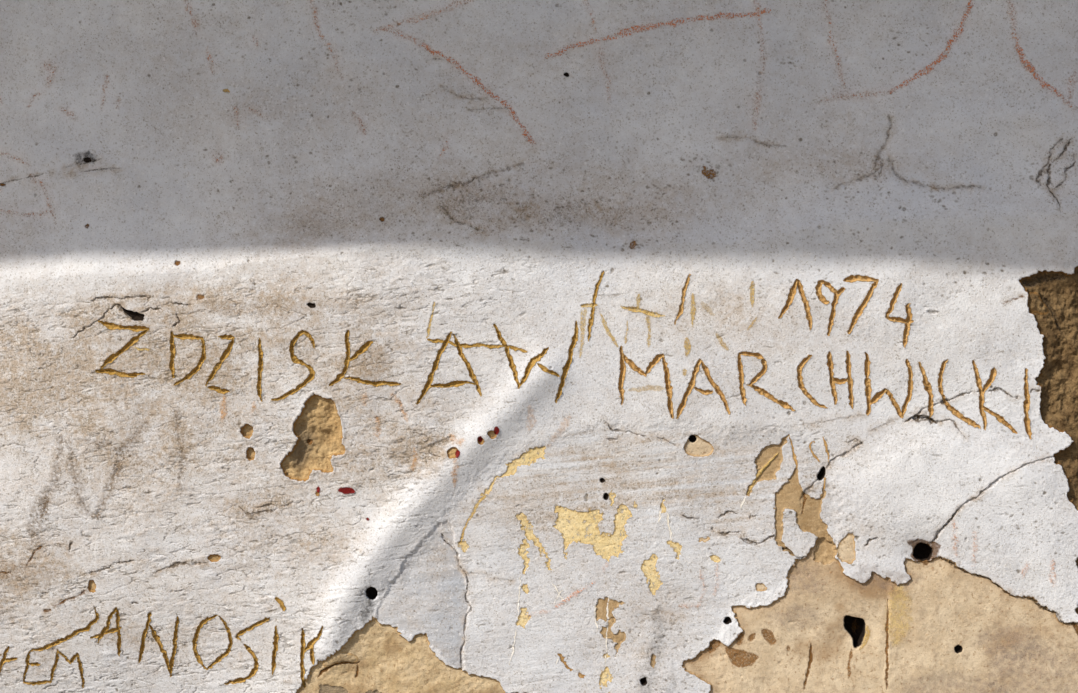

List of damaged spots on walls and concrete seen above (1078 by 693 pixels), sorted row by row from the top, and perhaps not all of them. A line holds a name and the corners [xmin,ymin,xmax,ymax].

crack [1036,139,1074,206]
spalling [1019,266,1078,511]
spalling [280,394,345,482]
peeling [553,490,638,562]
spalling [682,434,1078,693]
spalling [296,617,518,693]